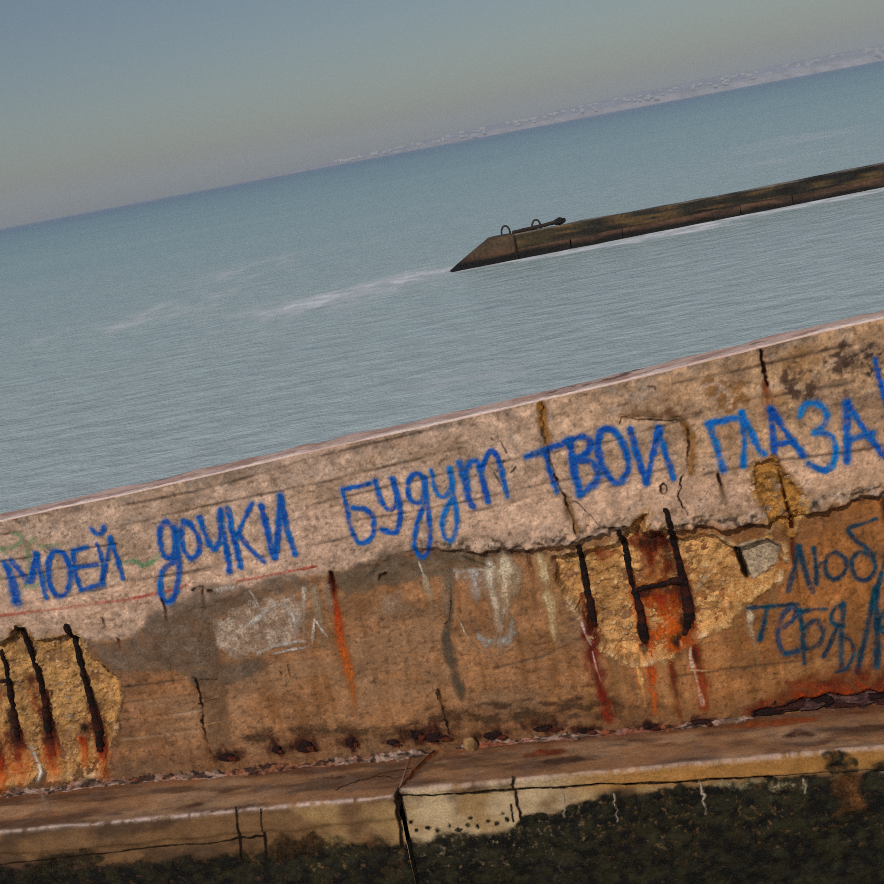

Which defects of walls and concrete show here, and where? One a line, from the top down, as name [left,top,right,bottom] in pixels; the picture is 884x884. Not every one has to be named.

crack [537,401,597,534]
peeling [619,408,696,508]
leakage [97,552,557,698]
rust [328,571,354,702]
rust [630,531,713,727]
spalling [549,454,811,667]
rust [0,708,24,780]
rust [27,677,58,769]
spalling [0,623,124,788]
crack [336,689,772,848]
rust [636,719,660,730]
rust [737,670,884,737]